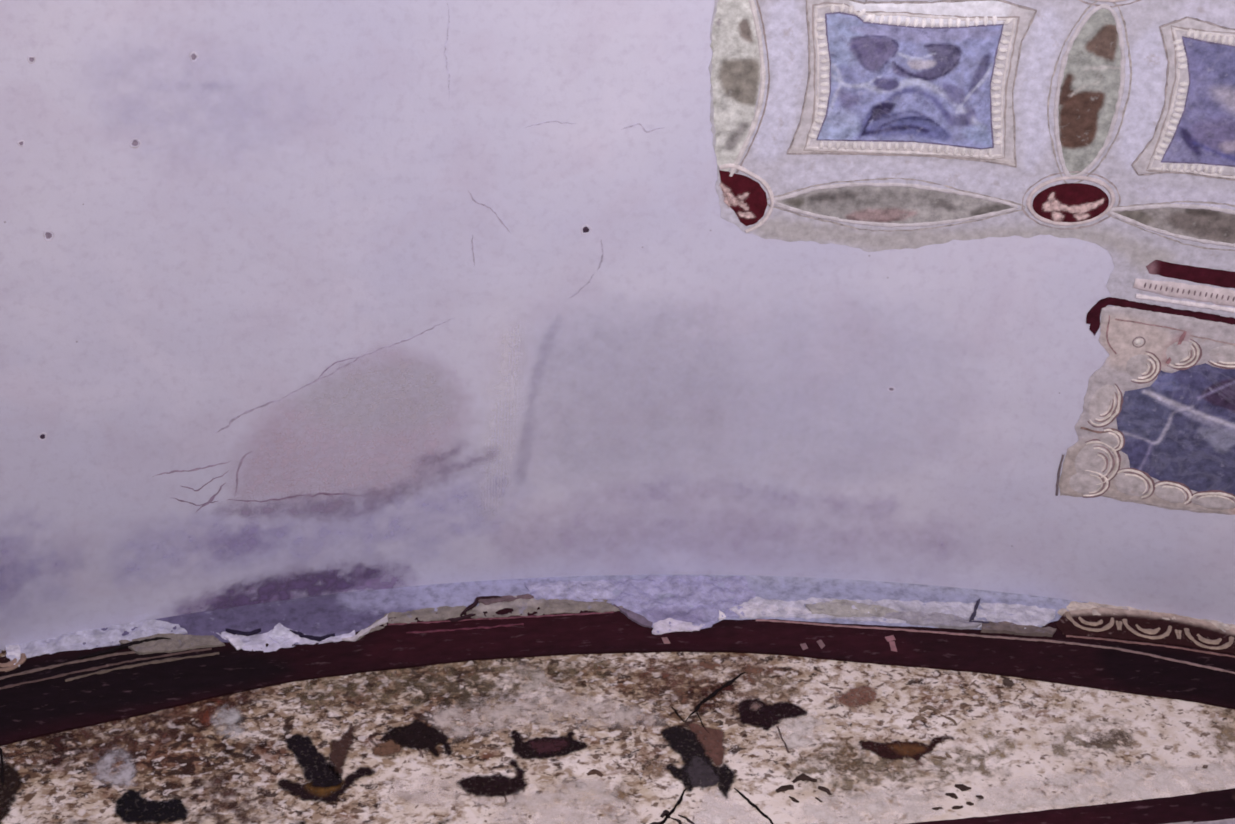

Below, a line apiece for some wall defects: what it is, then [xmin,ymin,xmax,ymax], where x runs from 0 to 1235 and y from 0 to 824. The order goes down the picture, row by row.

crack [215,318,453,433]
leakage [152,451,372,515]
leakage [184,565,399,614]
spalling [0,575,1235,667]
crack [671,672,746,732]
crack [660,788,687,824]
crack [734,788,774,824]